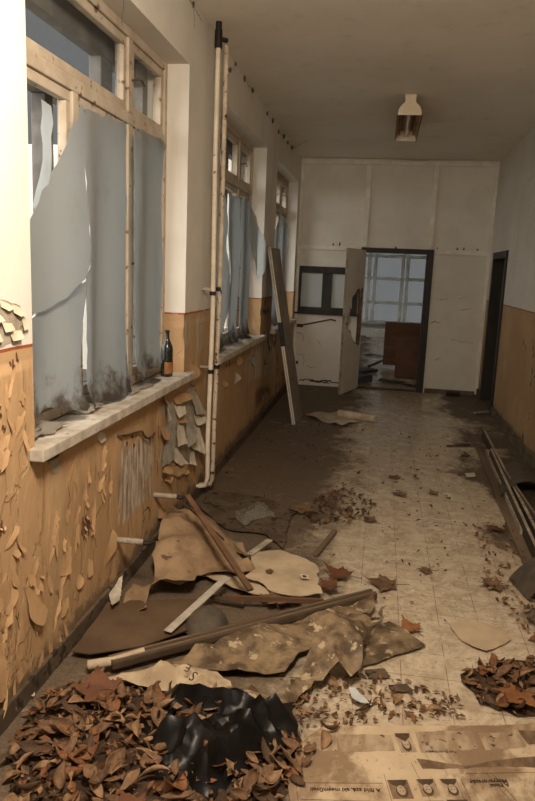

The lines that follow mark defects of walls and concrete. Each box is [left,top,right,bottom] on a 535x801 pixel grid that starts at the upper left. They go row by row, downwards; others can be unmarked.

peeling [0,299,30,348]
peeling [0,352,212,719]